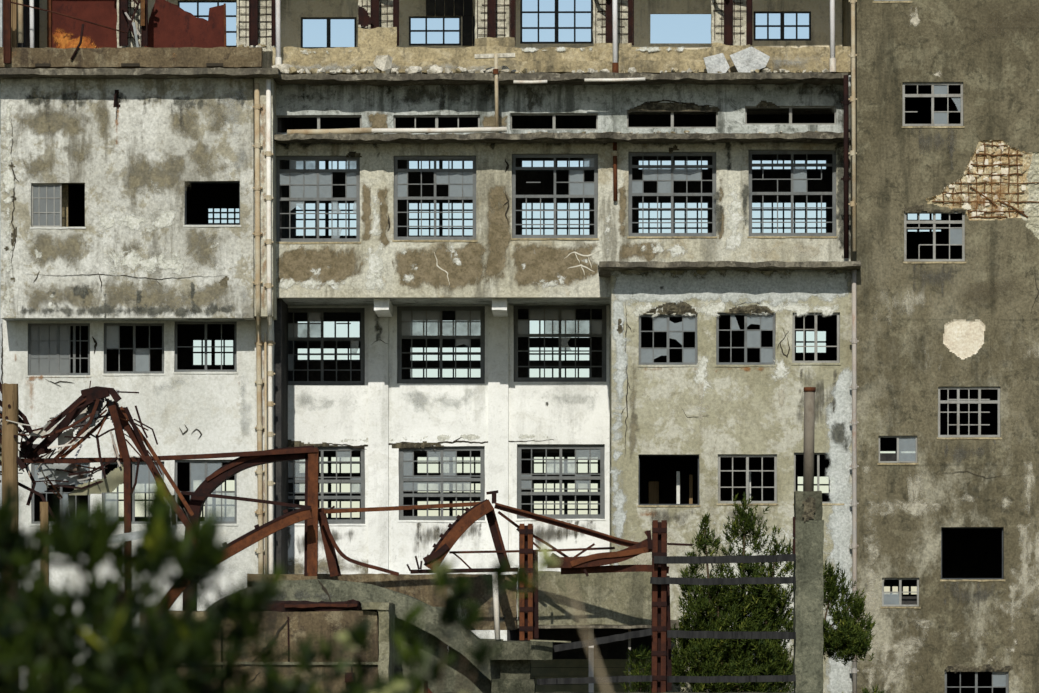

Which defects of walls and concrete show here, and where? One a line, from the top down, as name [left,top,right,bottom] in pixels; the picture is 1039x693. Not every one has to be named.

corrosion [54,30,96,49]
damp [25,92,93,113]
crack [10,119,230,286]
spalling [926,140,1039,239]
peeling [277,184,688,291]
crack [567,250,600,275]
damp [21,282,232,318]
peeling [943,319,985,359]
damp [870,480,938,516]
damp [1000,526,1039,615]
damp [863,536,920,690]